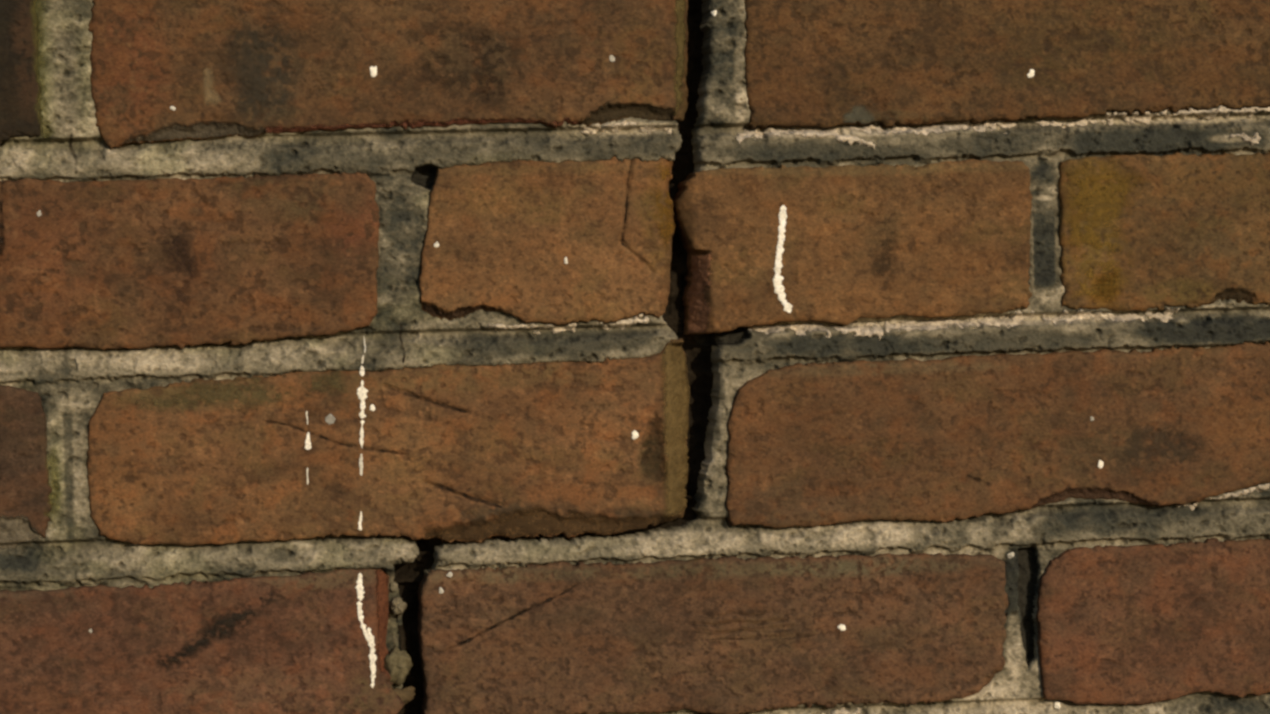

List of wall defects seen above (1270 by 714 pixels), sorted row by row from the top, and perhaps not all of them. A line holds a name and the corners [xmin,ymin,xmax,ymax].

crack [0,179,8,255]
crack [389,0,714,714]